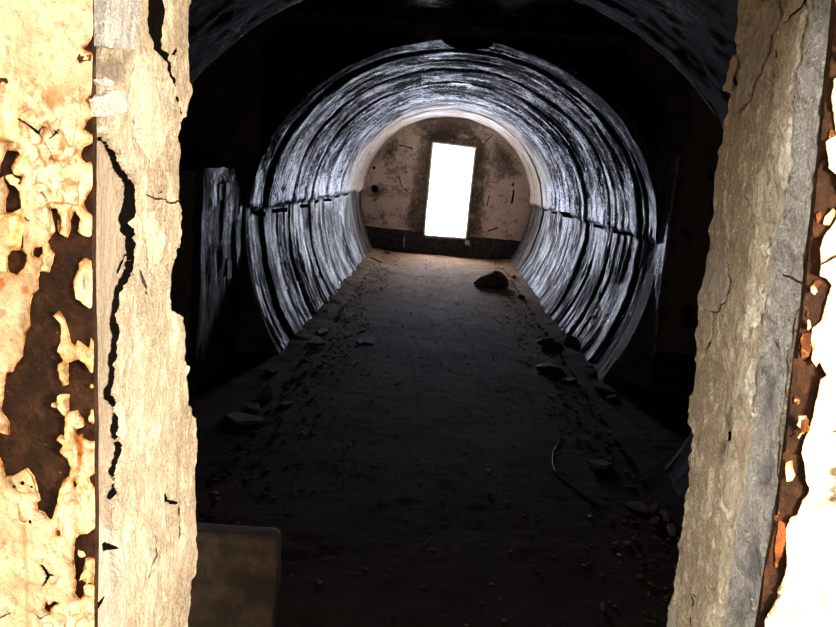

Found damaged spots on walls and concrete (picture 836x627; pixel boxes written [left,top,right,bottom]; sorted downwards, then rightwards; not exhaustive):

corrosion [0,151,22,213]
crack [17,118,59,162]
corrosion [0,189,95,519]
crack [97,137,180,505]
crack [147,0,182,114]
corrosion [760,274,831,619]